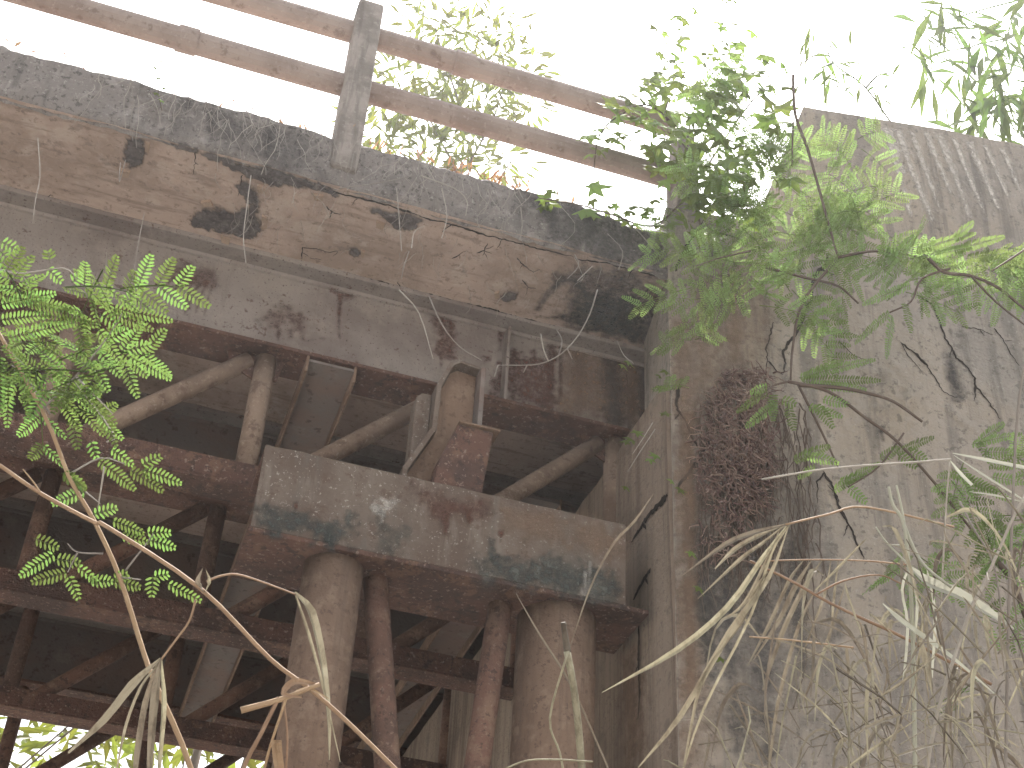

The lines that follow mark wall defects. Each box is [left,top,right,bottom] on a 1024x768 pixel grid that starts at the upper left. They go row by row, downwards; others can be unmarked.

rust [483,331,562,410]
crack [323,188,733,326]
water stain [532,198,664,344]
crack [765,257,834,375]
crack [900,298,1020,419]
crack [632,379,711,542]
crack [633,568,651,600]